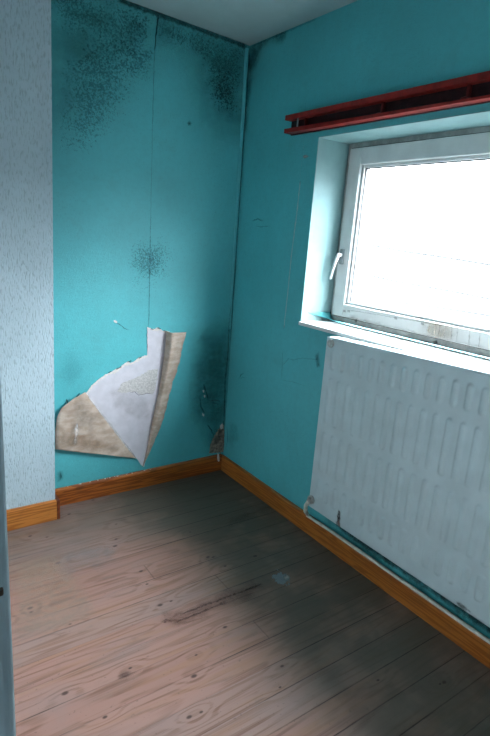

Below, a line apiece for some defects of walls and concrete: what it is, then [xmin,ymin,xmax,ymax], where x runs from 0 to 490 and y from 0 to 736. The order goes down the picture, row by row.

flaking render [209,423,225,462]
water stain [340,527,426,587]